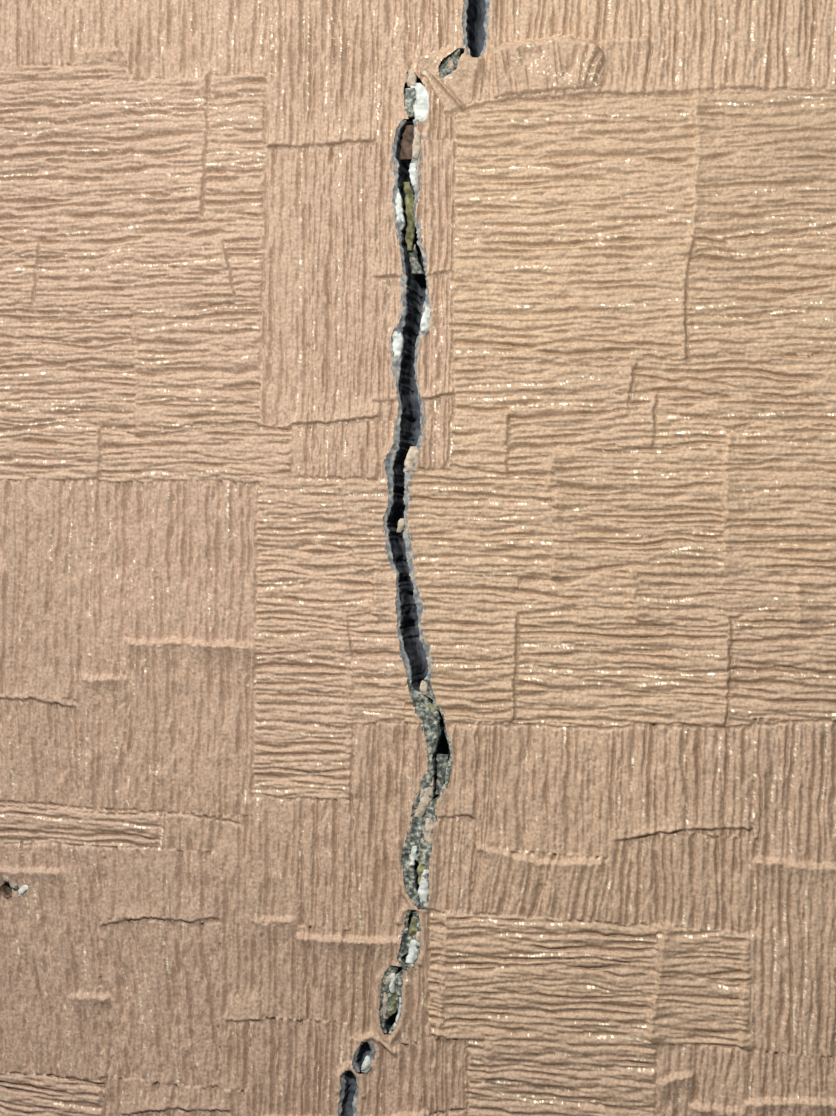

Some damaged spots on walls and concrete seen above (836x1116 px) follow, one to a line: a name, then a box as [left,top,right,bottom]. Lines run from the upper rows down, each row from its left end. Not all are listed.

crack [438,0,490,78]
crack [336,119,455,1116]